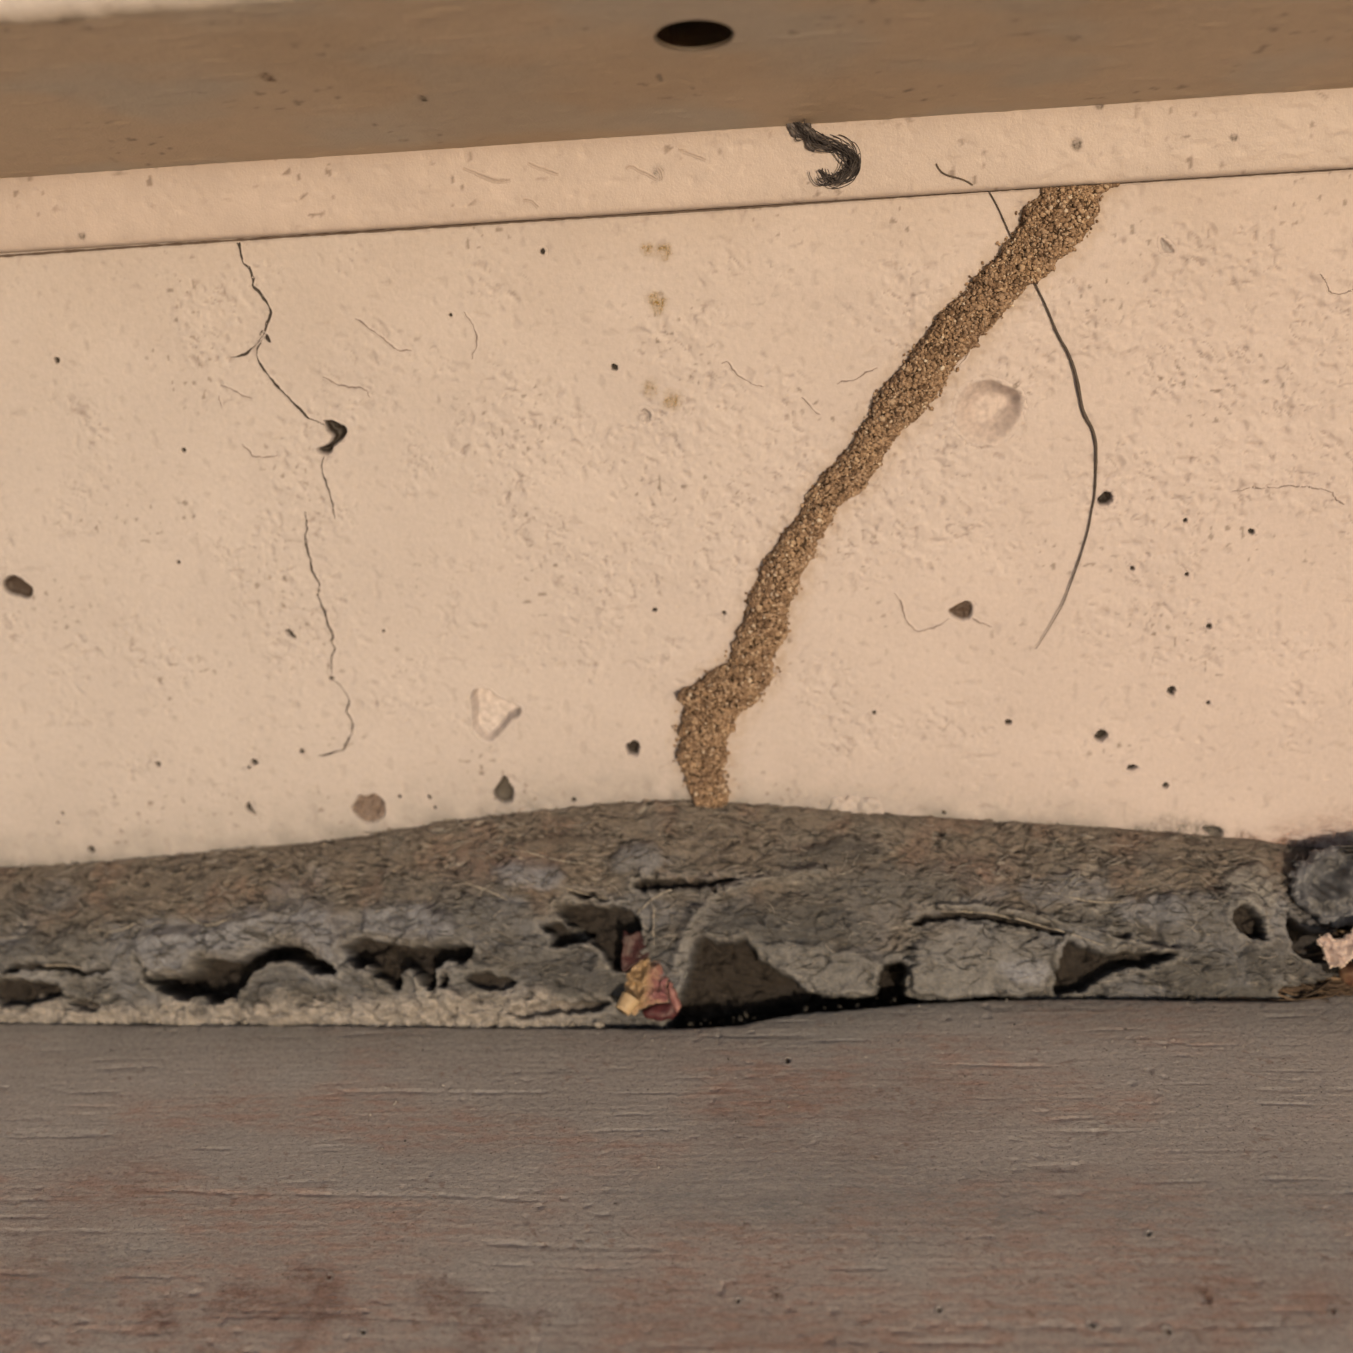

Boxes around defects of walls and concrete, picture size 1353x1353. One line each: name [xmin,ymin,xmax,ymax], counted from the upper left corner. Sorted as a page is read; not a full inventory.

crack [217,242,355,757]
crack [323,376,372,397]